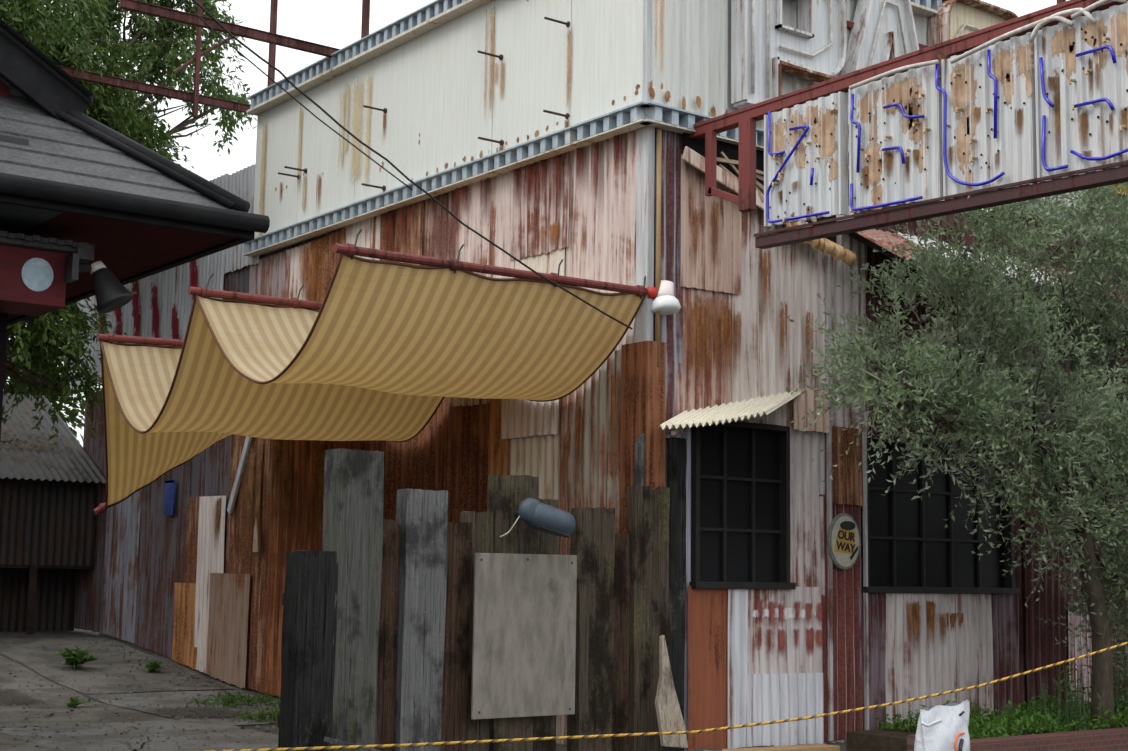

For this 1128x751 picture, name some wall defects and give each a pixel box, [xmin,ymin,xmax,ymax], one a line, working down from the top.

corrosion [484,9,504,107]
corrosion [655,0,664,69]
corrosion [612,82,728,117]
corrosion [426,120,568,176]
corrosion [513,154,562,201]
corrosion [576,142,599,188]
corrosion [692,201,719,258]
corrosion [761,251,787,355]
corrosion [683,295,741,371]
corrosion [241,439,331,532]
corrosion [756,599,823,653]
corrosion [906,601,963,642]